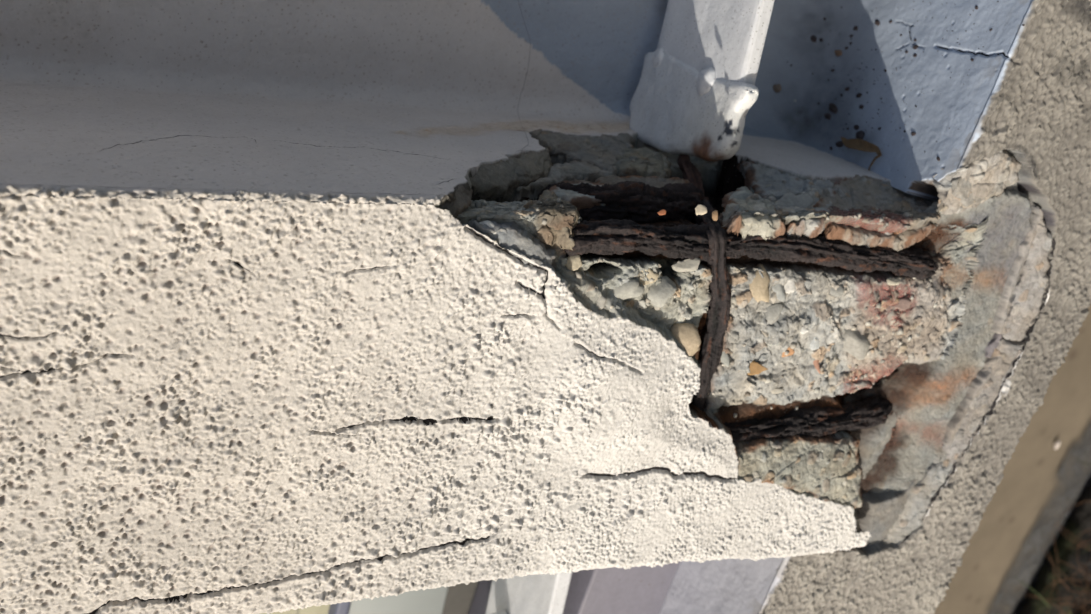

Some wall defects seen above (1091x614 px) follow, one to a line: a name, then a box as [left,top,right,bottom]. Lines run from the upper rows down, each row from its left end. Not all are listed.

crack [900,22,1009,58]
spalling [436,129,1055,554]
corrosion [851,363,931,415]
crack [899,237,1056,546]
crack [310,416,494,436]
crack [587,467,735,480]
corrosion [860,428,902,495]
crack [86,524,503,614]